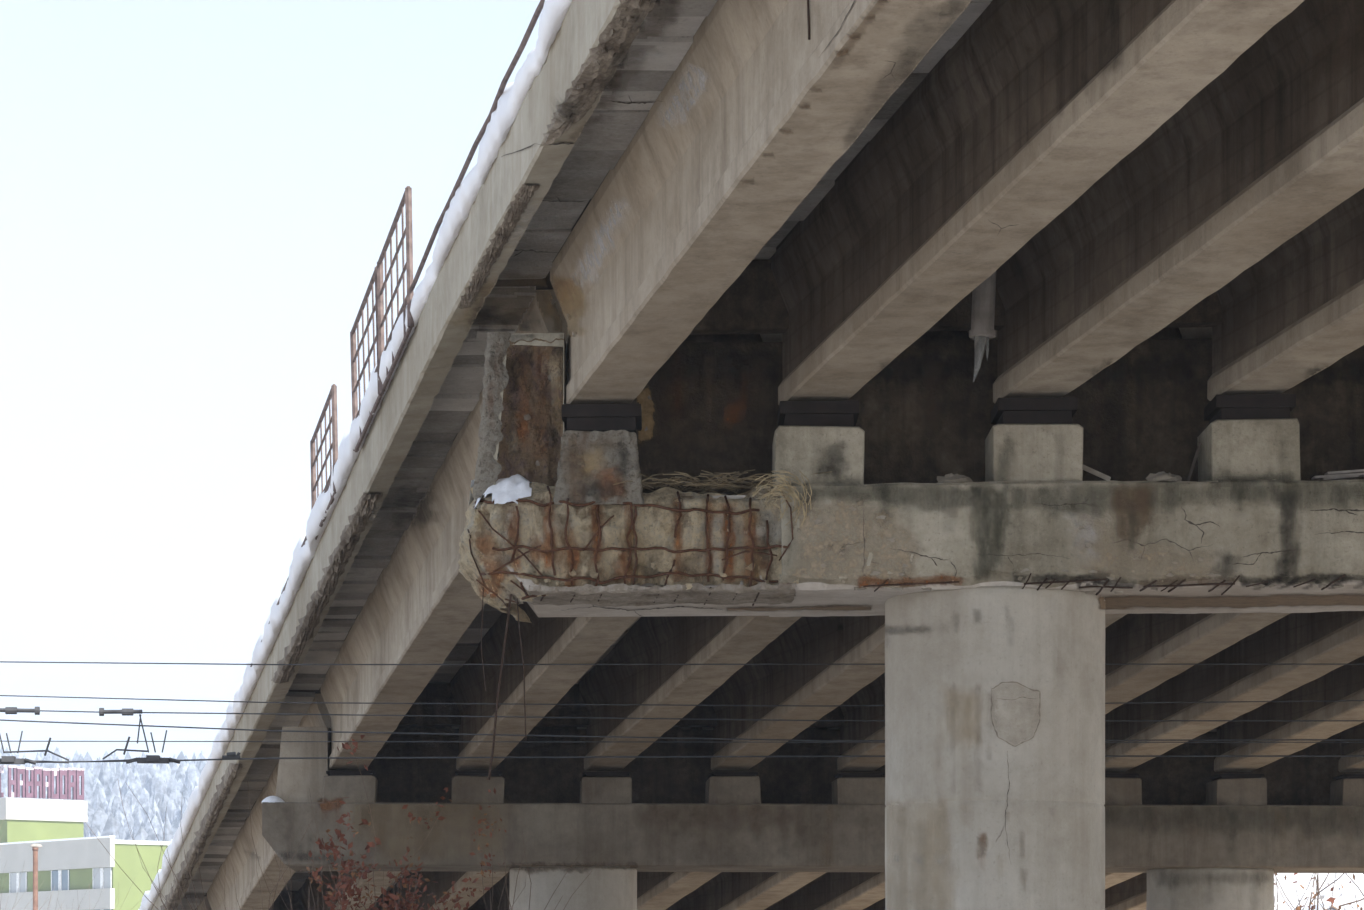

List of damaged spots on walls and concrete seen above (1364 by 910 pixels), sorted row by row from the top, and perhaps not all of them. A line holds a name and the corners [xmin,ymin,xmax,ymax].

spalling [542,0,660,146]
spalling [458,332,961,623]
crack [1110,507,1220,562]
crack [1236,508,1364,565]
spalling [1014,568,1364,610]